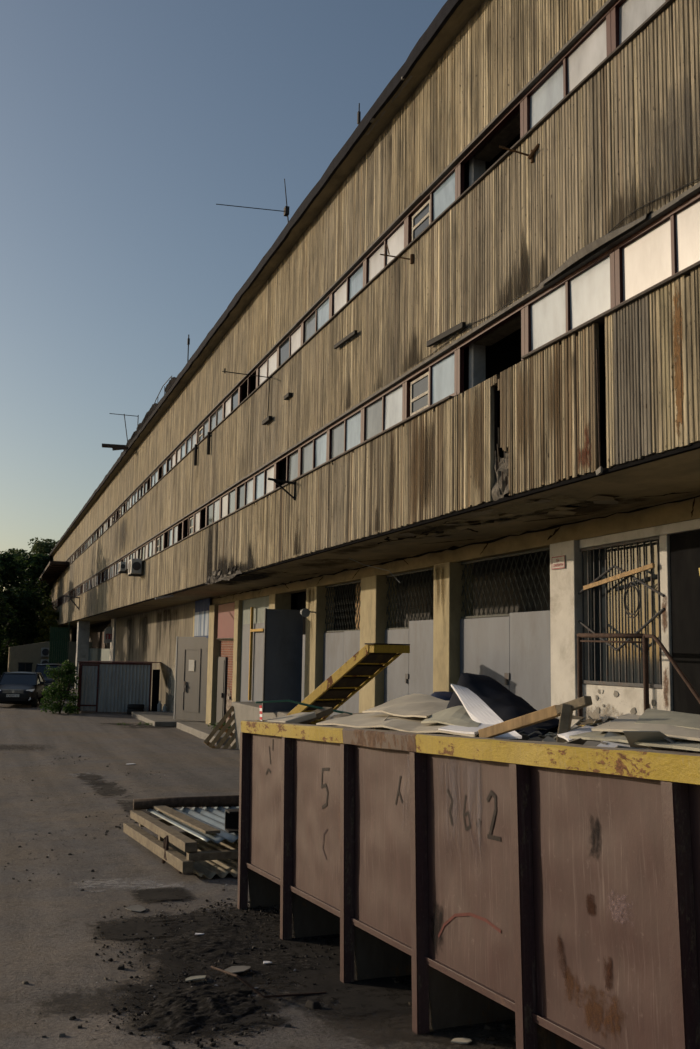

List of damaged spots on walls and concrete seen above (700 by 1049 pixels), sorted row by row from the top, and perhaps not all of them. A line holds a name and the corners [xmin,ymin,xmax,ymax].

leakage [499,238,546,308]
corrosion [673,287,684,431]
spalling [498,398,507,458]
leakage [207,524,254,581]
crack [212,492,700,599]